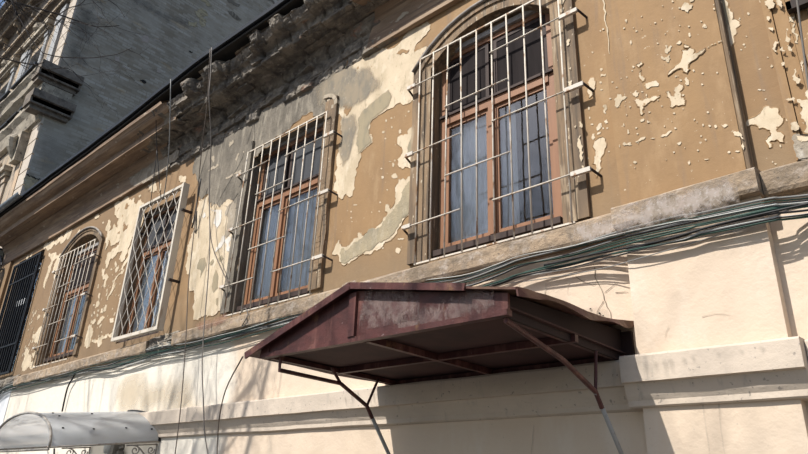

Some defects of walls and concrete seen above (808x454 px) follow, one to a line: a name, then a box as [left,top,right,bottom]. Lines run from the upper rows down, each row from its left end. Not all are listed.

peeling [765,0,783,31]
peeling [767,17,798,68]
peeling [568,0,750,178]
peeling [694,89,808,161]
flaking render [84,0,431,349]
peeling [43,229,80,289]
crack [567,267,629,315]
peeling [0,304,49,391]
flaking render [149,330,180,353]